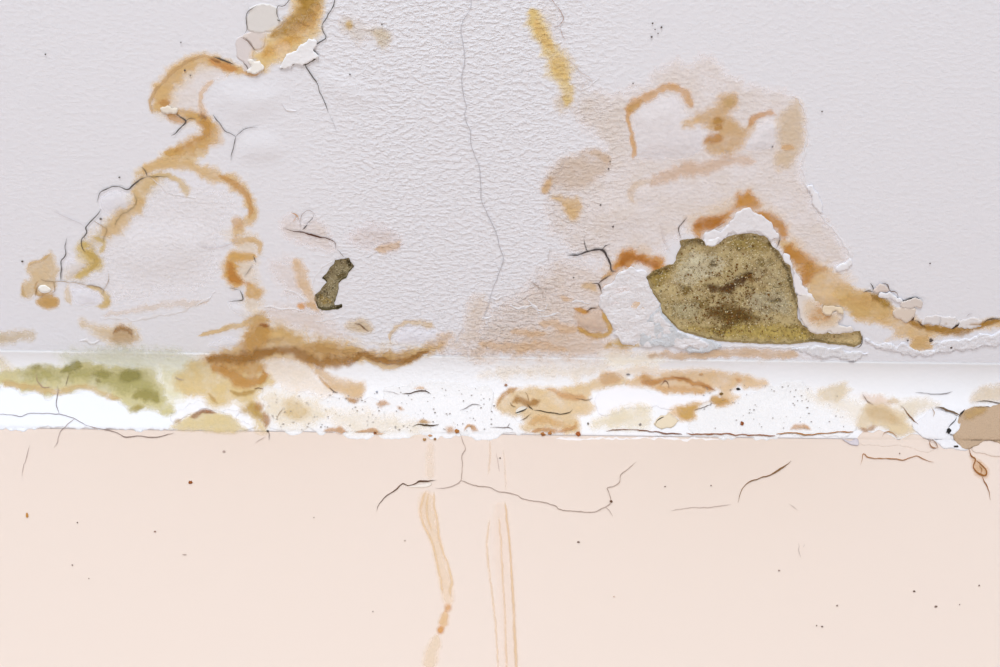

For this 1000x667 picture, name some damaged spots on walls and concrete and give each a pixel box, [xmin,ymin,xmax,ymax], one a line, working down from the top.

peeling [235,3,284,74]
peeling [280,39,319,69]
damp [70,0,322,308]
damp [528,9,843,265]
crack [35,170,160,296]
spalling [264,258,354,311]
crack [548,241,617,312]
spalling [599,207,1000,361]
damp [0,260,614,432]
crack [377,424,636,513]
damp [497,348,797,434]
crack [861,391,998,462]